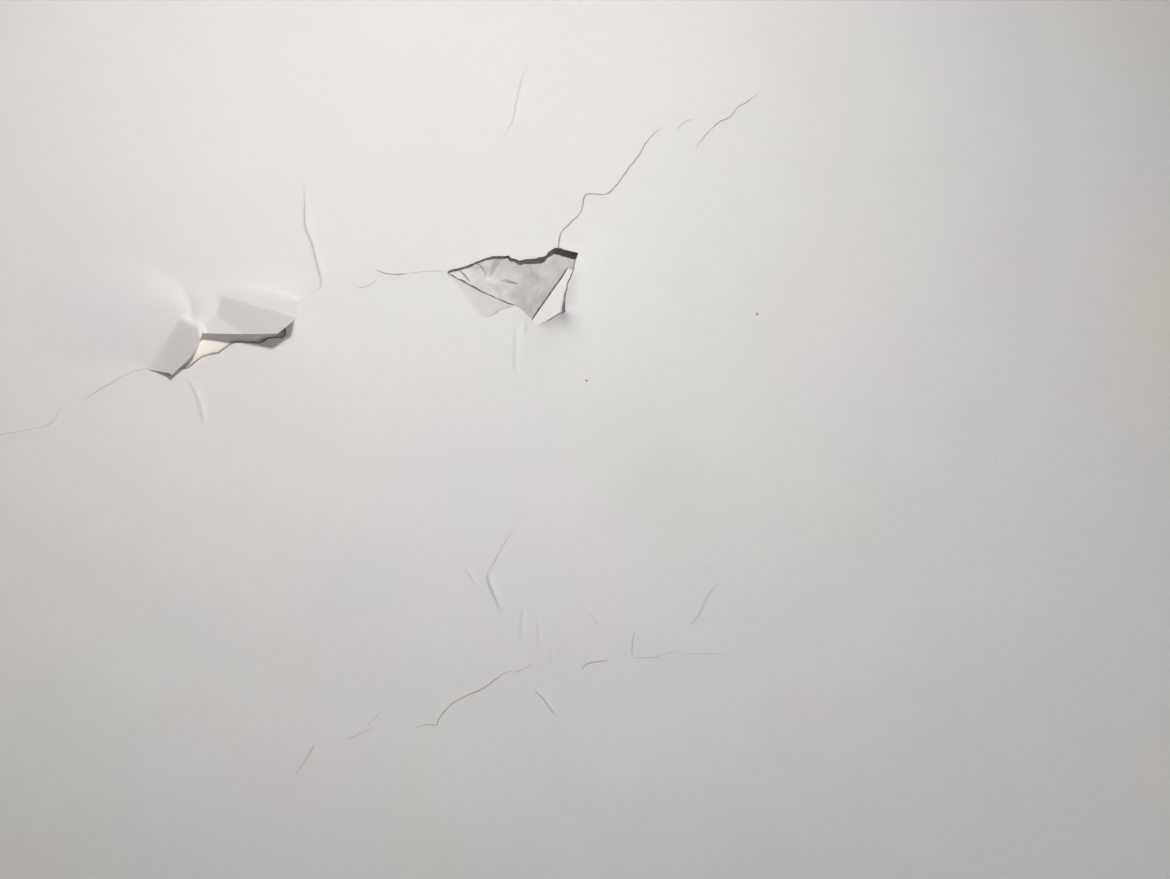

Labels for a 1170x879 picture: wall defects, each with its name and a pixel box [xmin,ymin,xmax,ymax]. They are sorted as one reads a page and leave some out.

crack [301,184,331,299]
crack [557,93,759,249]
peeling [0,205,665,436]